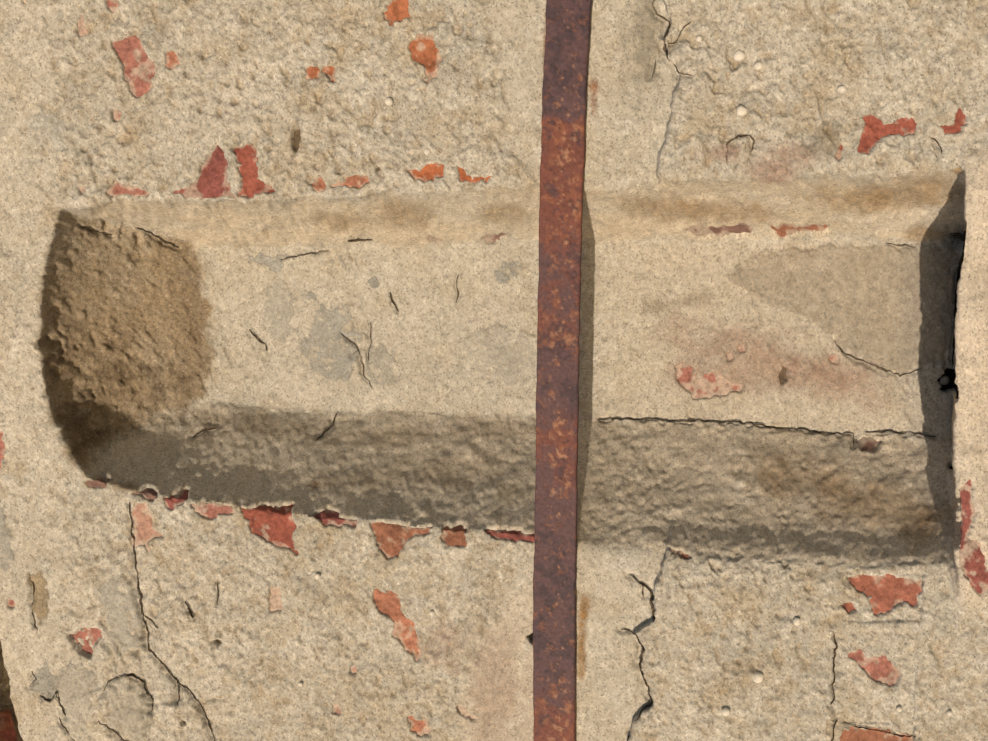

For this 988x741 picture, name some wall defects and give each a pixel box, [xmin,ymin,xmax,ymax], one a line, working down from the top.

crack [651,0,692,79]
spalling [858,115,917,154]
spalling [174,143,275,198]
crack [952,231,966,367]
crack [834,340,922,377]
crack [598,418,937,442]
spalling [131,488,299,555]
spalling [370,522,467,559]
spalling [959,479,988,594]
crack [104,502,215,741]
spalling [847,574,922,615]
crack [29,671,75,741]